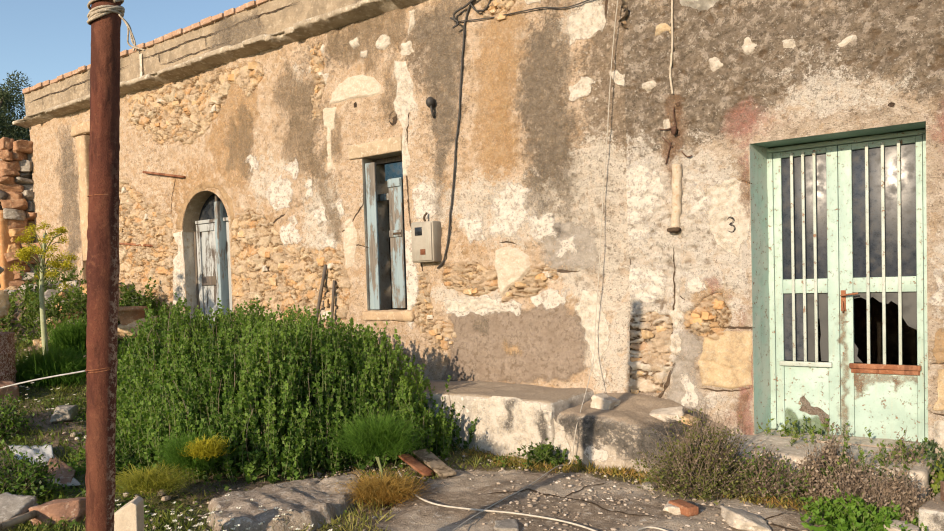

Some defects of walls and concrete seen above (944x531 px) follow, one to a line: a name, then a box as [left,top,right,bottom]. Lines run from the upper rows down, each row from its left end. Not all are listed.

spalling [128,61,264,145]
spalling [309,41,329,120]
leakage [518,22,572,213]
peeling [282,159,313,199]
spalling [119,177,178,319]
spalling [230,199,352,330]
peeling [459,212,485,243]
spalling [405,230,567,351]
peeling [529,212,577,258]
spalling [627,271,732,394]
flaking render [932,328,944,411]
peeling [799,395,830,432]